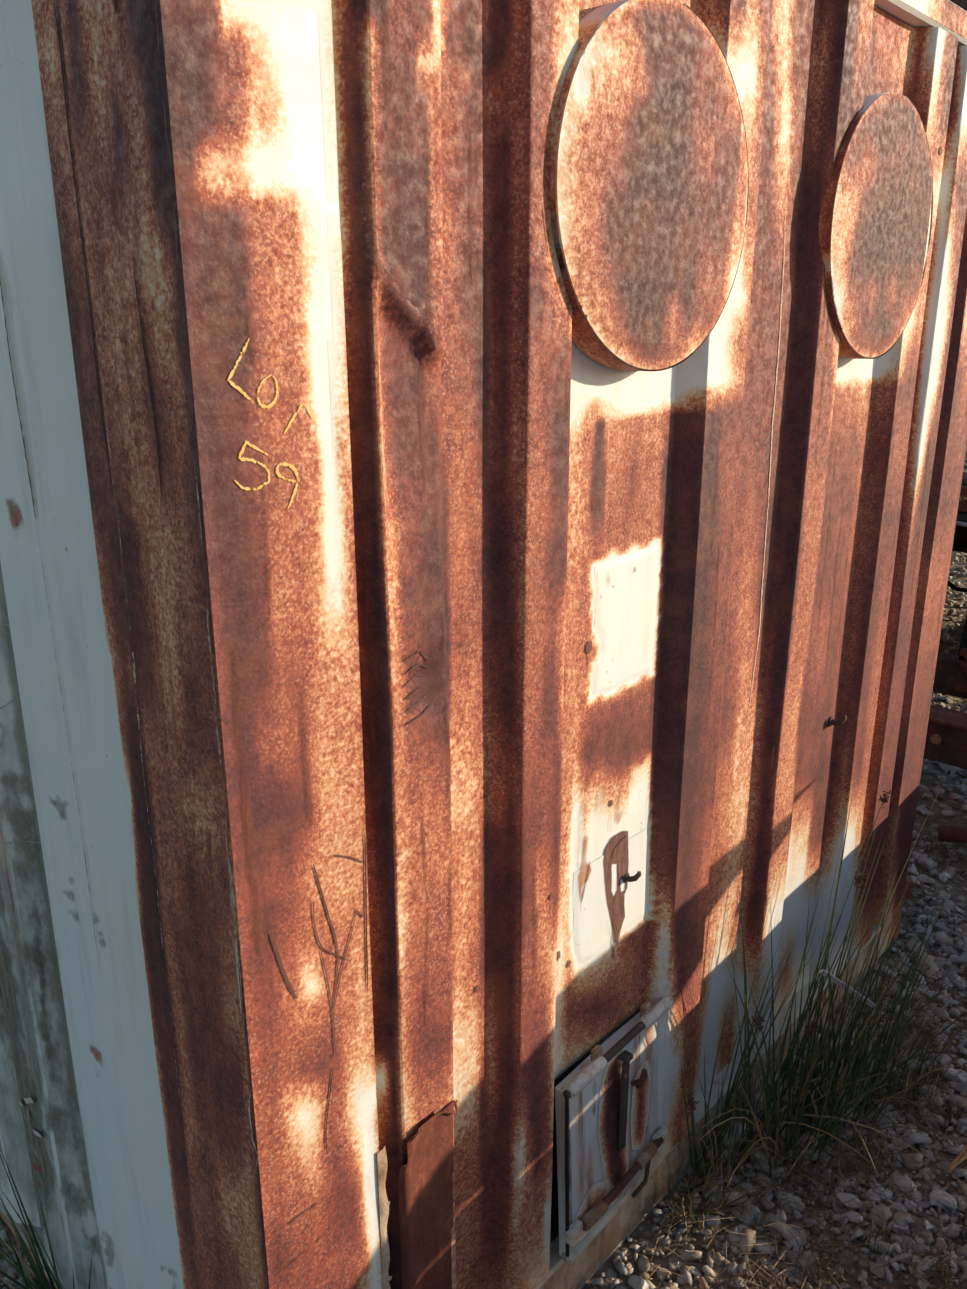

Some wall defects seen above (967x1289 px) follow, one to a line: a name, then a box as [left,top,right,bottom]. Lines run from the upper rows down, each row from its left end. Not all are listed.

damp [3,775,42,870]
damp [0,908,90,1229]
rust [31,0,516,1289]
rust [507,0,967,1289]